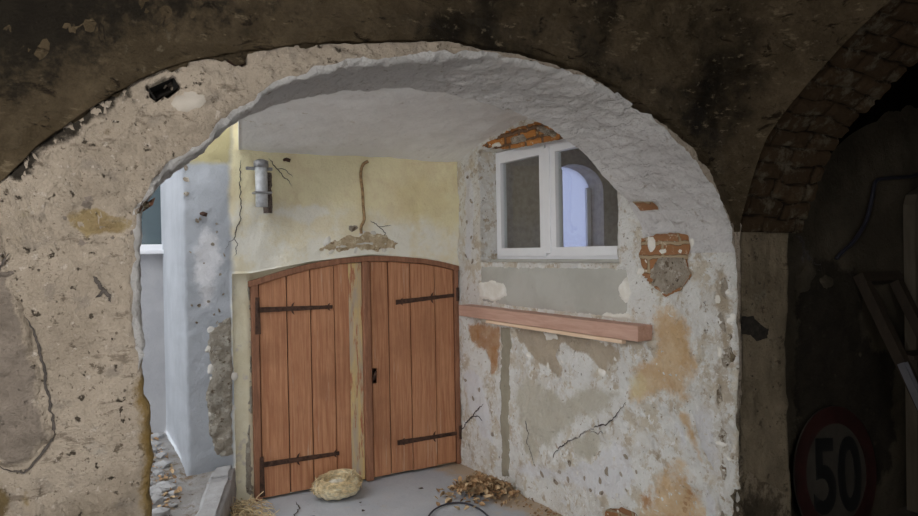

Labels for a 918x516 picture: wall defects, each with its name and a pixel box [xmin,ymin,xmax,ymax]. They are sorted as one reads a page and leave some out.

flaking render [483,122,563,149]
spalling [319,225,398,254]
flaking render [636,233,694,297]
water stain [0,468,40,516]
peeling [0,223,56,474]
spalling [187,218,238,457]
spalling [245,425,253,495]
crack [525,402,626,463]
water stain [512,295,721,516]
flaking render [604,507,637,516]
spalling [709,261,768,500]